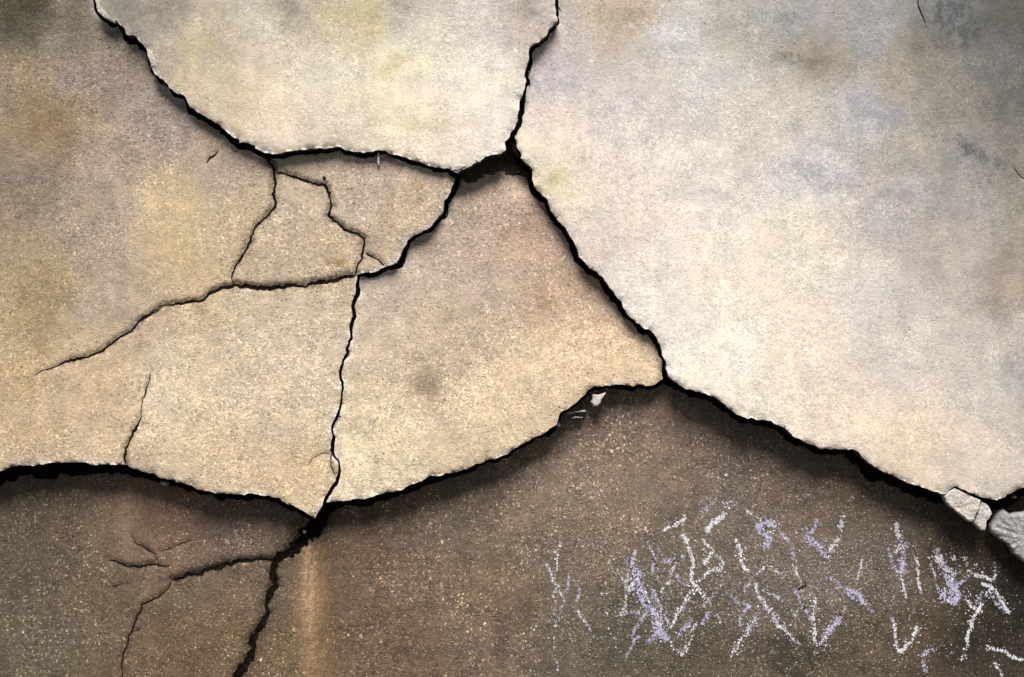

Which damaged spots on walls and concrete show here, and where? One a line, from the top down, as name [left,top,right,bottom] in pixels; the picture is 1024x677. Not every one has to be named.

crack [509,0,944,503]
crack [0,0,558,677]
spalling [556,392,606,427]
peeling [941,487,1024,562]
crack [955,487,1024,511]